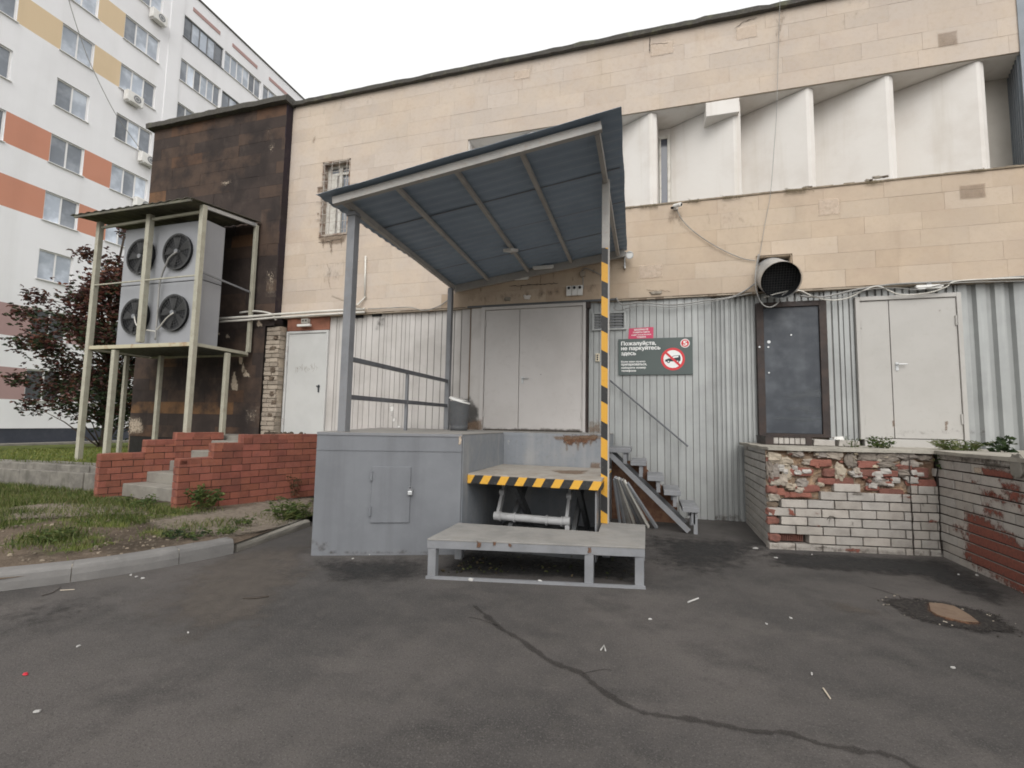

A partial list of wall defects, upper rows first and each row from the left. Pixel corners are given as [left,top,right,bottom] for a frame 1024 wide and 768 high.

rust [555,435,598,448]
spalling [765,450,937,542]
peeling [953,462,1024,594]